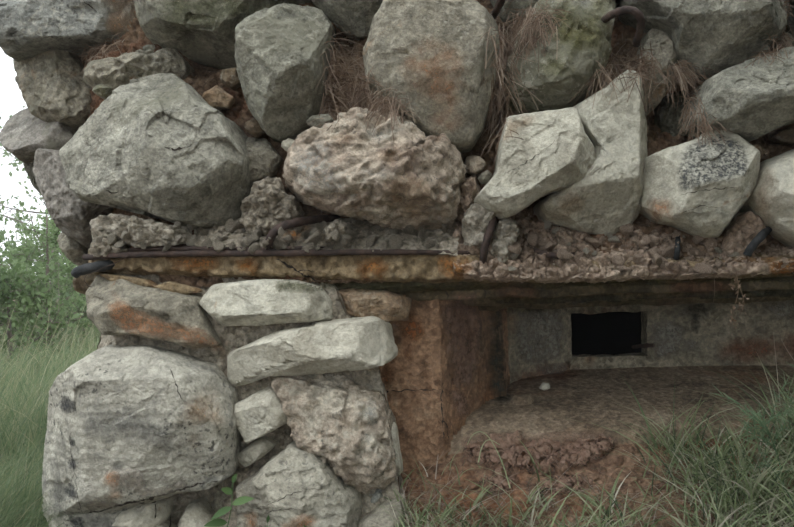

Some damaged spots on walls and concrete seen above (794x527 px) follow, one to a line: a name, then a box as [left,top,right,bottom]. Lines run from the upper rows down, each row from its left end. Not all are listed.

crack [277,259,316,281]
crack [387,385,449,438]